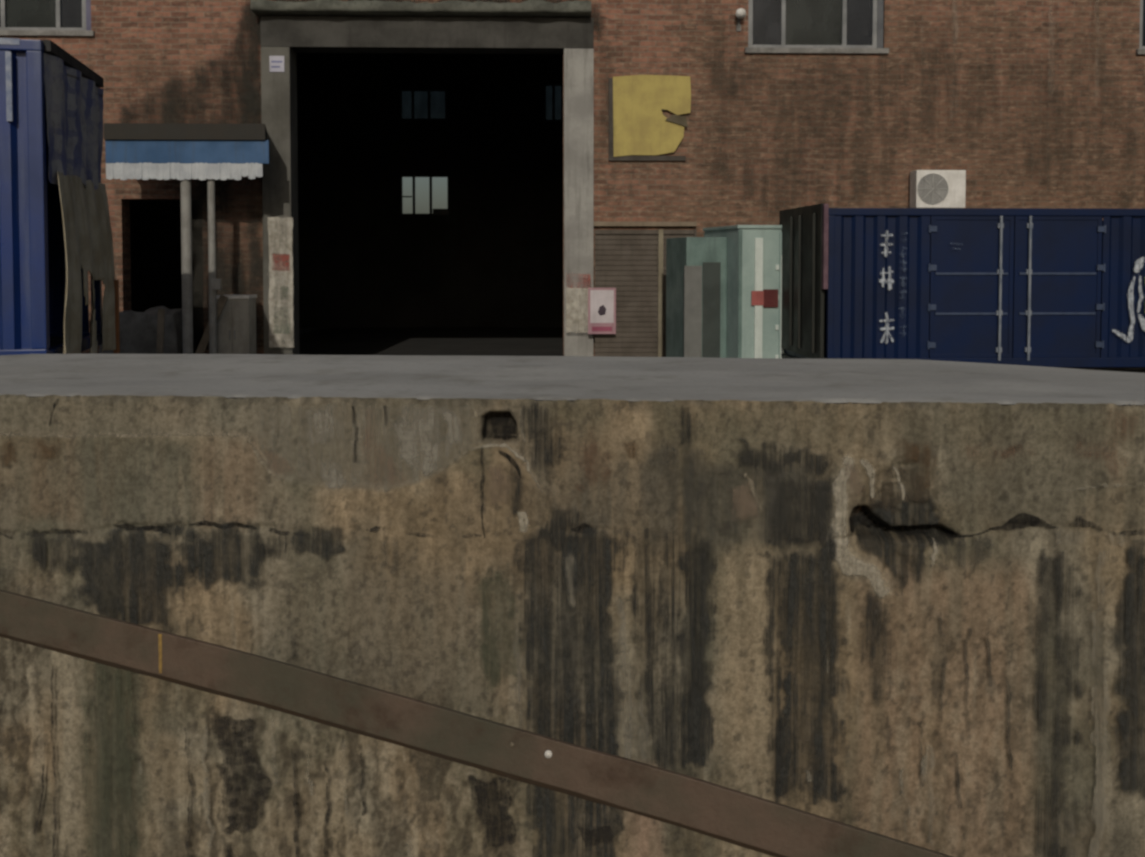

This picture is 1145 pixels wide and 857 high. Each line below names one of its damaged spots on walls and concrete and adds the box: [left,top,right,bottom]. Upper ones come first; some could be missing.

crack [5,529,81,538]
damp [30,523,345,624]
crack [114,521,298,535]
crack [464,443,537,538]
crack [572,523,590,533]
damp [514,455,716,769]
damp [739,439,849,805]
spalling [826,457,988,598]
crack [988,513,1142,536]
damp [1034,535,1145,857]
damp [527,786,623,857]